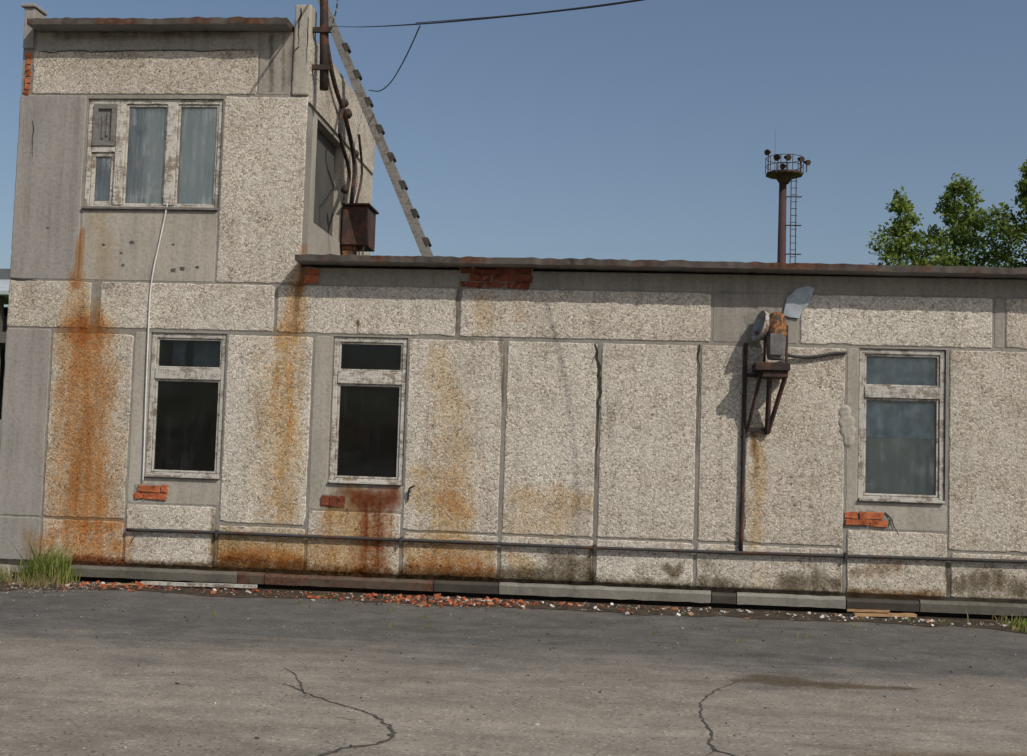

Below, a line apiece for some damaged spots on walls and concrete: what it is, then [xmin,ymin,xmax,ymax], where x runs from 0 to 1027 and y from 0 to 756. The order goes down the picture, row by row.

flaking render [459,267,534,290]
crack [591,343,602,478]
corrosion [72,555,126,565]
corrosion [341,486,401,577]